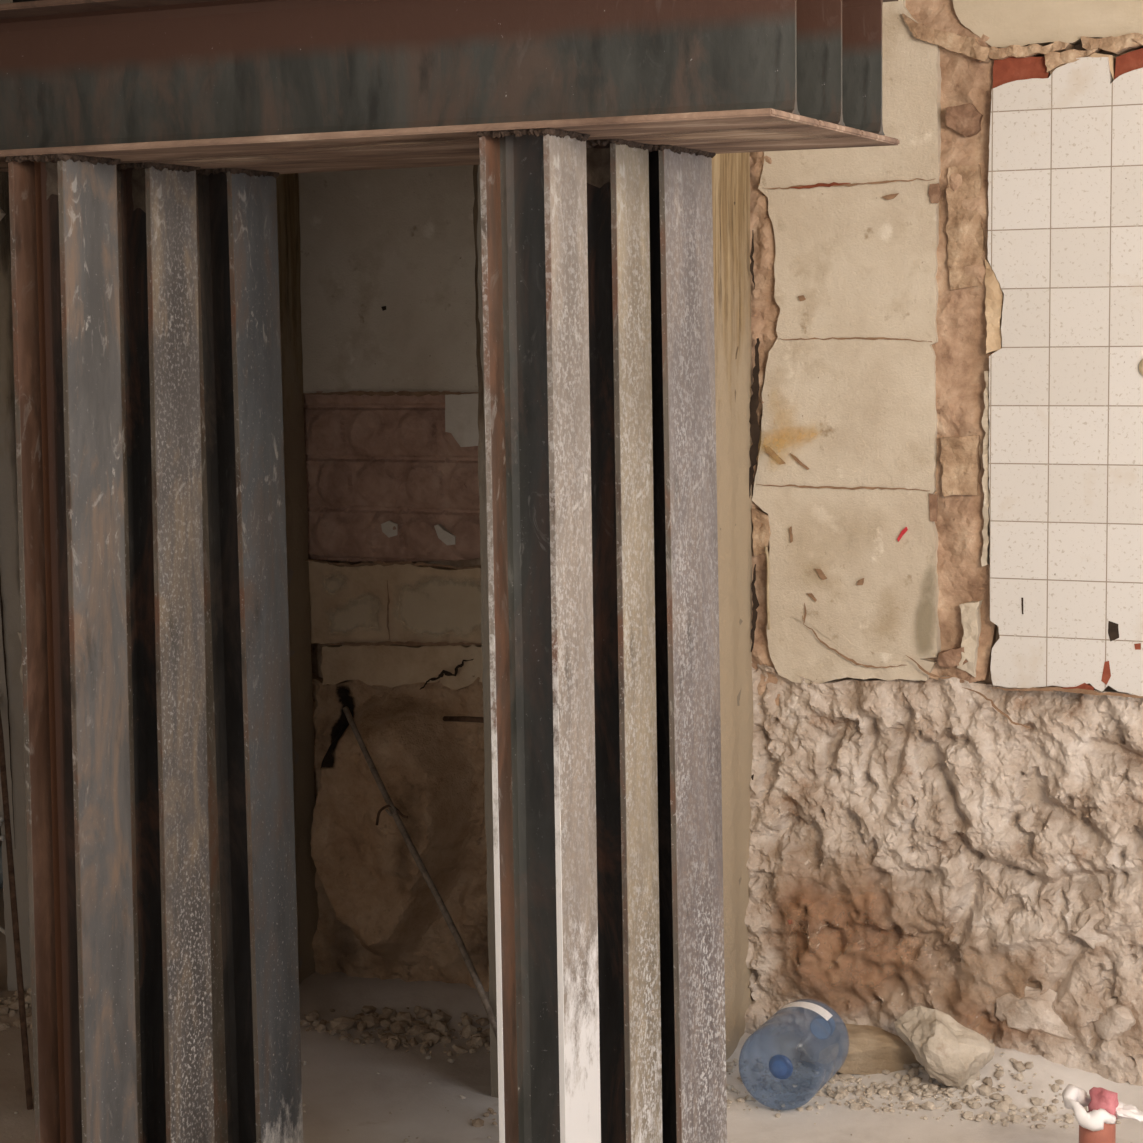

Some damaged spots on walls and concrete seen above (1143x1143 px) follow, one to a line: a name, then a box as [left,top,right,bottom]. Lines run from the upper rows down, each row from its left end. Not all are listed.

spalling [902,13,1143,73]
peeling [928,164,1004,354]
spalling [750,152,809,706]
peeling [929,371,990,566]
crack [305,560,482,689]
peeling [938,600,983,677]
spalling [321,686,354,768]